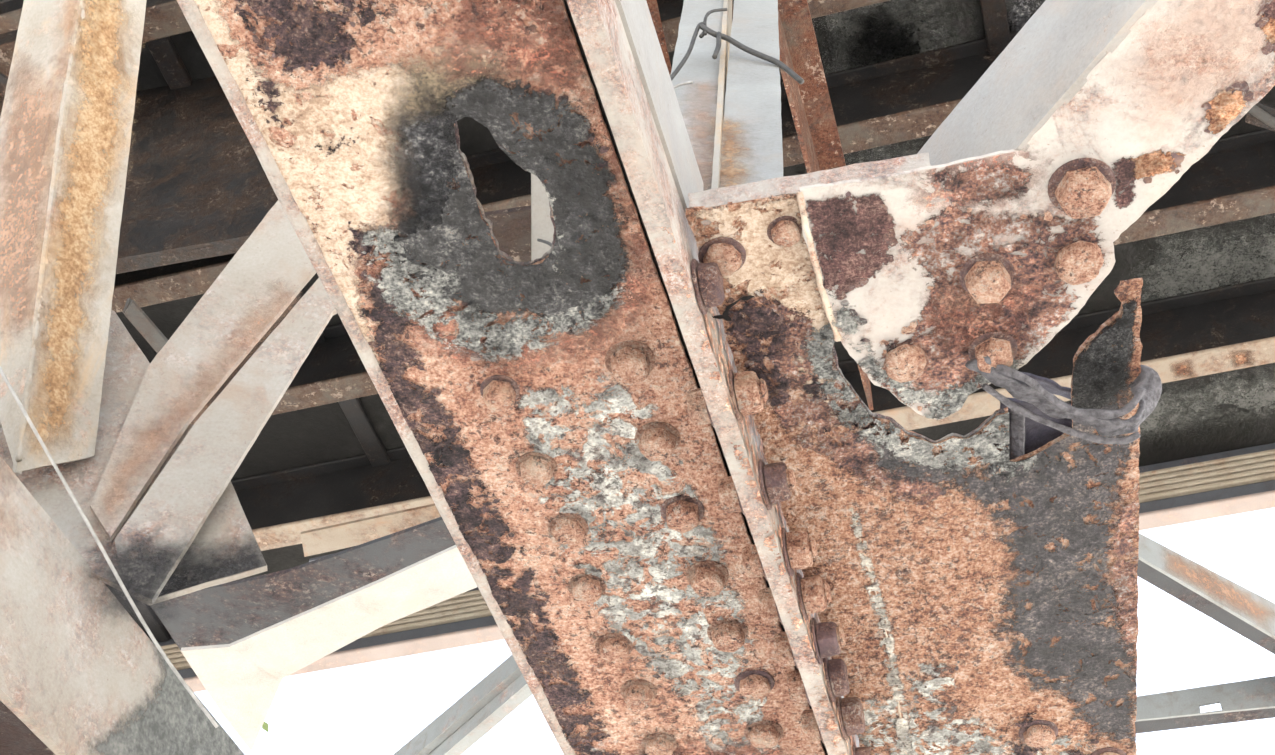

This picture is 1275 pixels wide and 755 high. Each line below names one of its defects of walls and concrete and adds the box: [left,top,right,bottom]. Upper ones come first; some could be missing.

corrosion [443,0,580,87]
corrosion [1255,0,1275,55]
corrosion [0,0,129,447]
peeling [194,0,414,381]
peeling [526,169,566,272]
corrosion [692,111,749,187]
corrosion [1112,150,1186,209]
corrosion [1201,81,1254,134]
corrosion [366,206,648,369]
corrosion [872,153,1106,411]
corrosion [672,265,856,755]